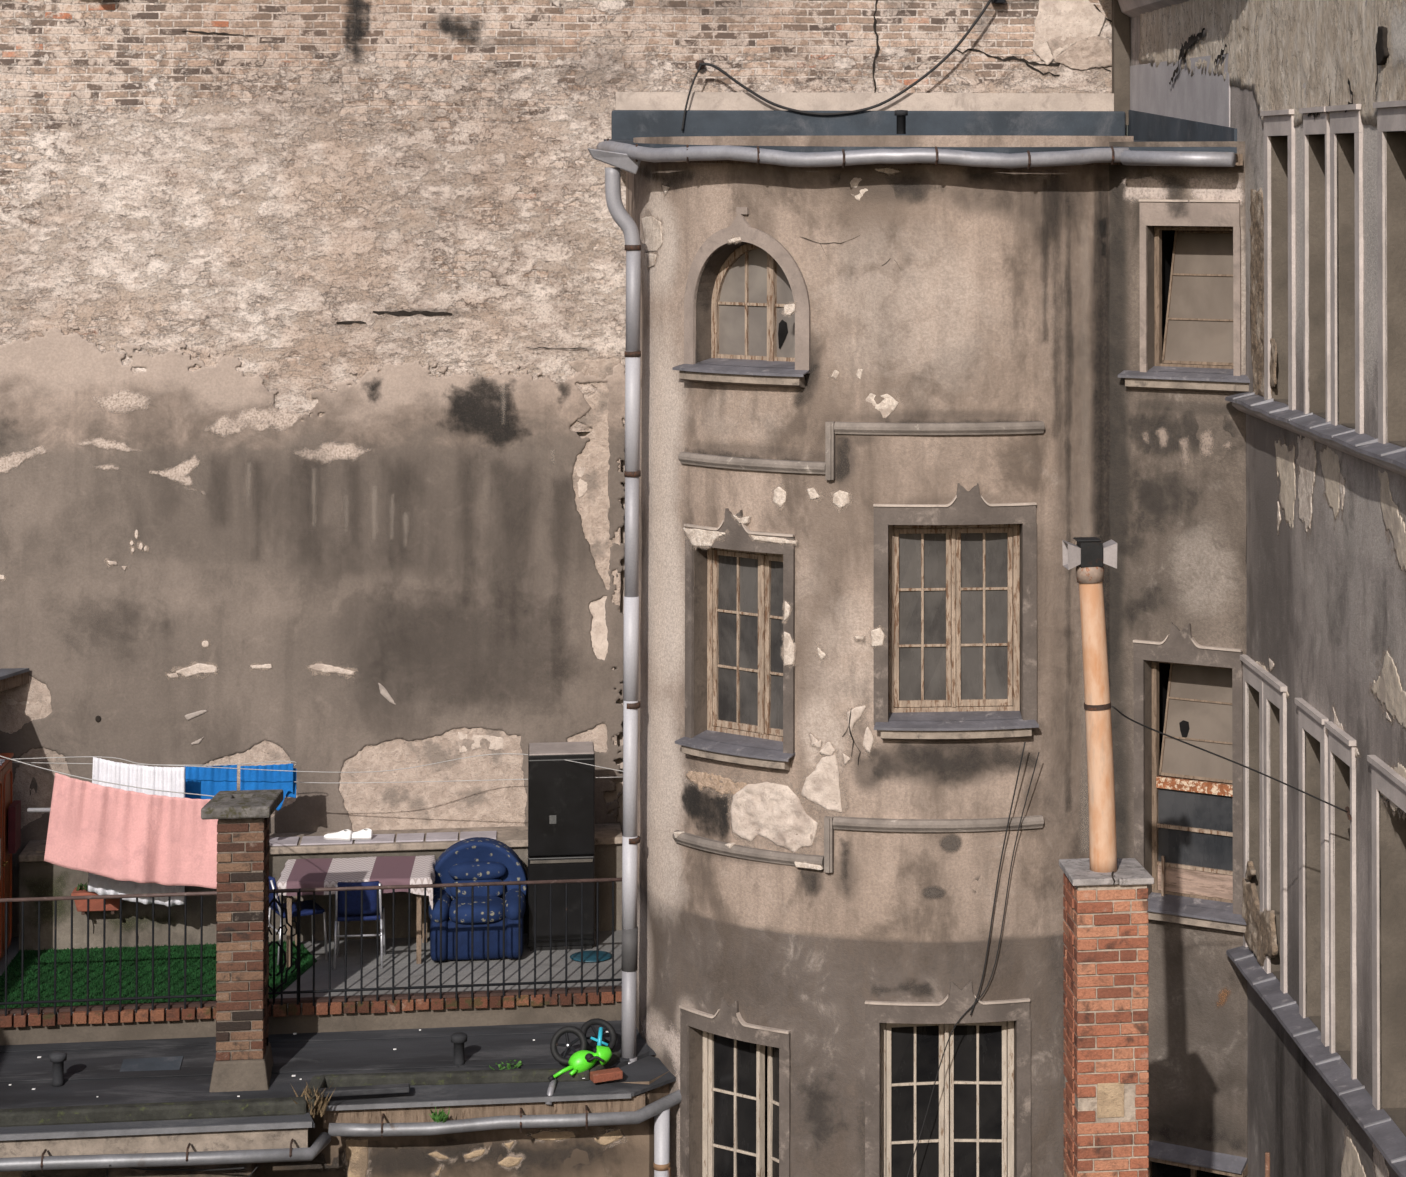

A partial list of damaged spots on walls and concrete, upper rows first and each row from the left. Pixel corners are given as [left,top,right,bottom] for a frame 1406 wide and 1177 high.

crack [872,0,880,93]
crack [956,49,1061,76]
flaking render [0,0,1112,670]
peeling [1275,435,1346,535]
peeling [1378,470,1406,571]
peeling [1370,648,1406,729]
flaking render [339,727,527,831]
flaking render [686,769,751,796]
peeling [794,861,824,870]
flaking render [429,1131,575,1176]
flaking render [594,1130,623,1146]
peeling [1341,1126,1389,1177]